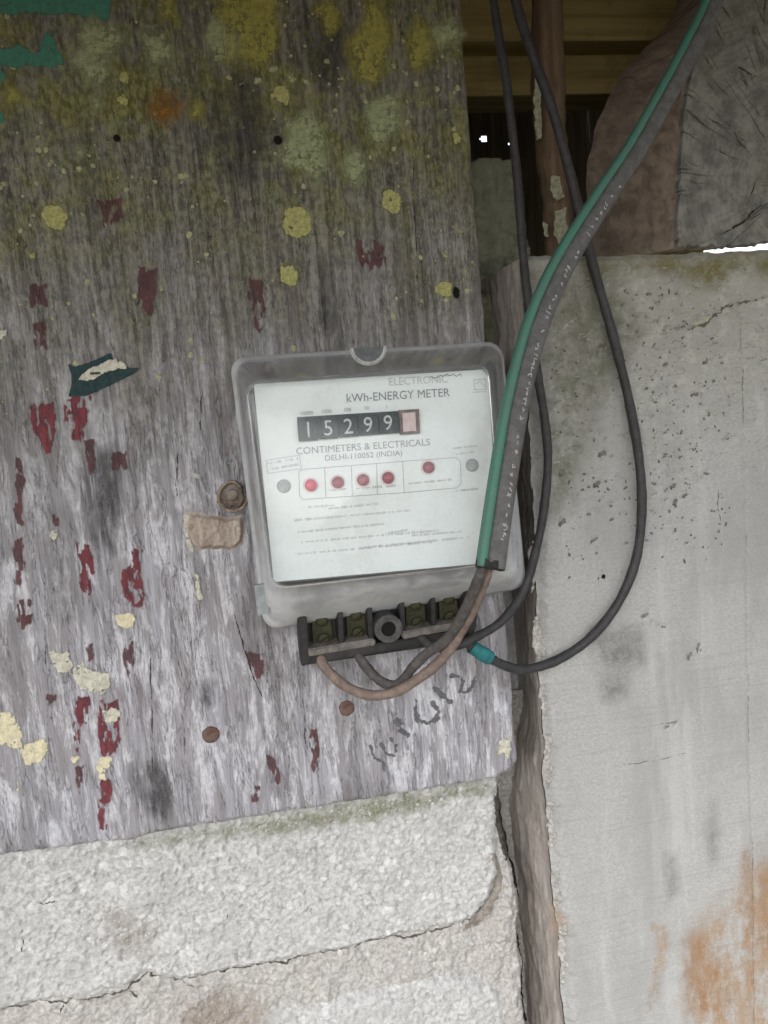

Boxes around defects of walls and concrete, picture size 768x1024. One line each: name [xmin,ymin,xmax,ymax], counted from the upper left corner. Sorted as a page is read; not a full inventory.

peeling [0,33,65,84]
damp [218,80,260,179]
peeling [30,395,96,474]
peeling [112,452,128,470]
peeling [13,457,32,630]
peeling [76,543,95,596]
peeling [121,548,145,608]
peeling [122,641,135,677]
peeling [73,696,121,756]
peeling [75,766,83,794]
peeling [97,779,112,830]
crack [4,906,481,1012]